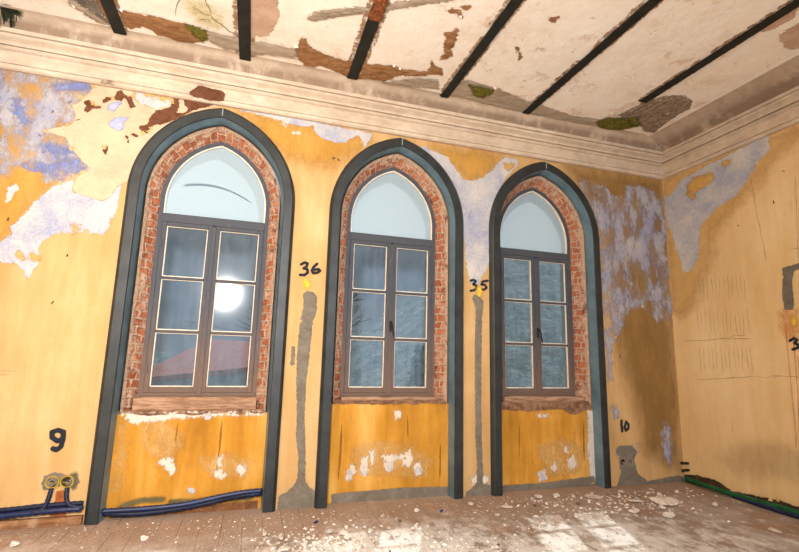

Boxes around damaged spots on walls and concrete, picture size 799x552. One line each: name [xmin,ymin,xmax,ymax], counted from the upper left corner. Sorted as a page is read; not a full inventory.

flaking render [115,0,239,53]
crack [175,0,238,34]
flaking render [251,0,374,76]
flaking render [358,0,799,133]
damp [0,69,76,239]
flaking render [0,70,227,282]
peeling [240,110,374,147]
peeling [421,146,518,284]
peeling [579,136,770,379]
peeling [120,407,265,425]
peeling [346,449,423,481]
spalling [501,401,595,484]